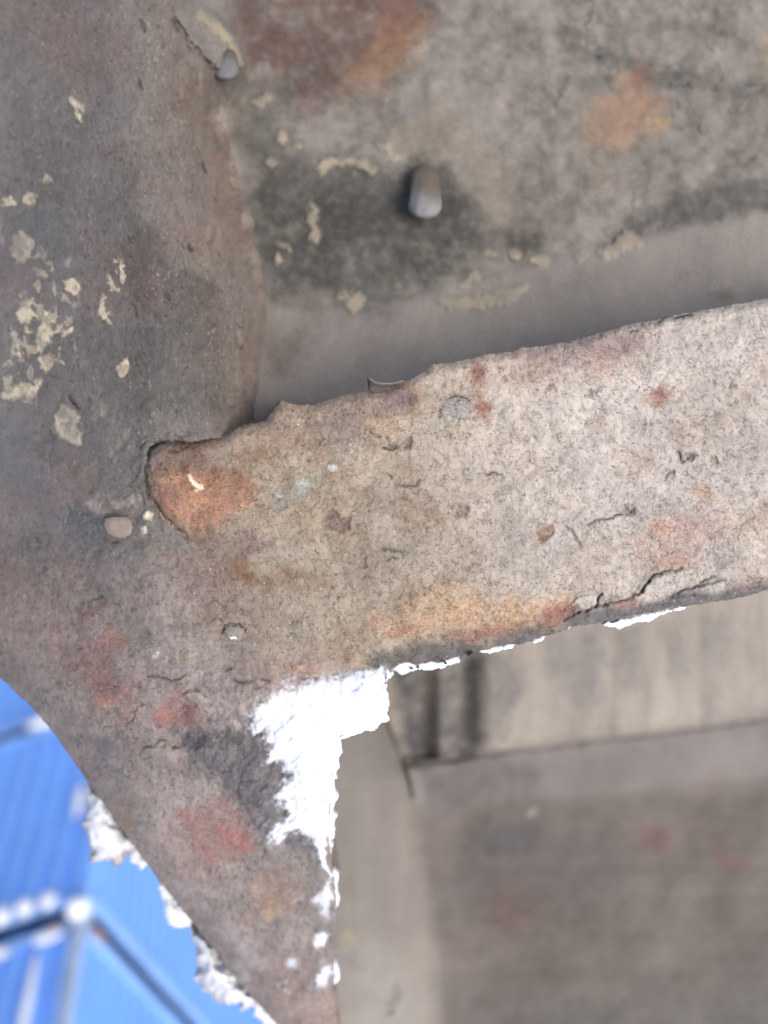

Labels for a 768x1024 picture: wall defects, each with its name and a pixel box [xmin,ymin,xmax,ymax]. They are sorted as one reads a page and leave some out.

rust [223,0,463,127]
rust [576,73,674,200]
peeling [305,200,323,246]
leakage [227,65,555,326]
peeling [96,258,126,326]
peeling [0,293,74,394]
peeling [115,358,129,378]
crack [140,440,186,535]
rust [52,594,211,736]
rust [375,574,589,657]
crack [563,568,720,621]
leakage [73,700,318,864]